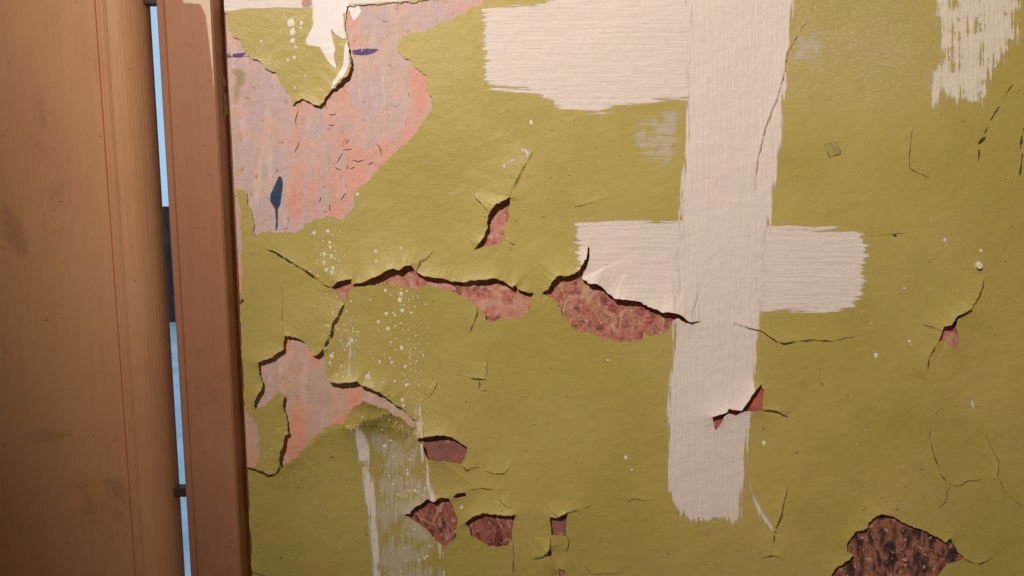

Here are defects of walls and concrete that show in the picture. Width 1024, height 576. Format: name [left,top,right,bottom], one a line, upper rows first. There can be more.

peeling [225,0,489,314]
spalling [321,189,701,355]
crack [734,323,856,344]
peeling [930,290,983,358]
peeling [242,323,478,487]
peeling [712,376,772,430]
spalling [397,488,524,556]
spalling [817,503,975,576]